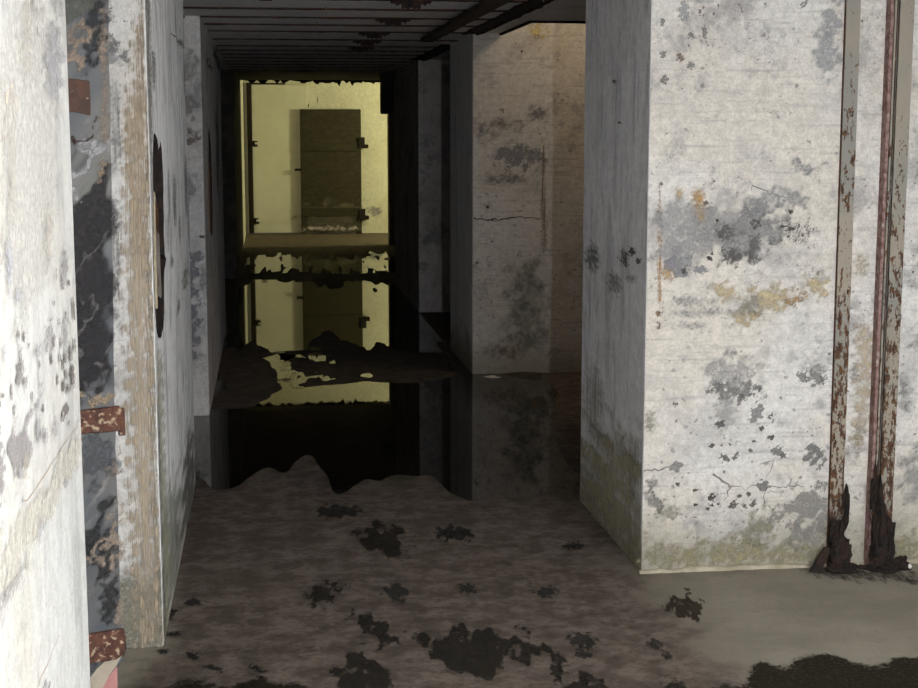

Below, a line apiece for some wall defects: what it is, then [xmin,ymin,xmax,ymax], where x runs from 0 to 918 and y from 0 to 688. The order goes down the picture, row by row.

spalling [153,133,166,338]
rust [850,326,873,446]
crack [644,461,686,473]
crack [712,460,804,511]